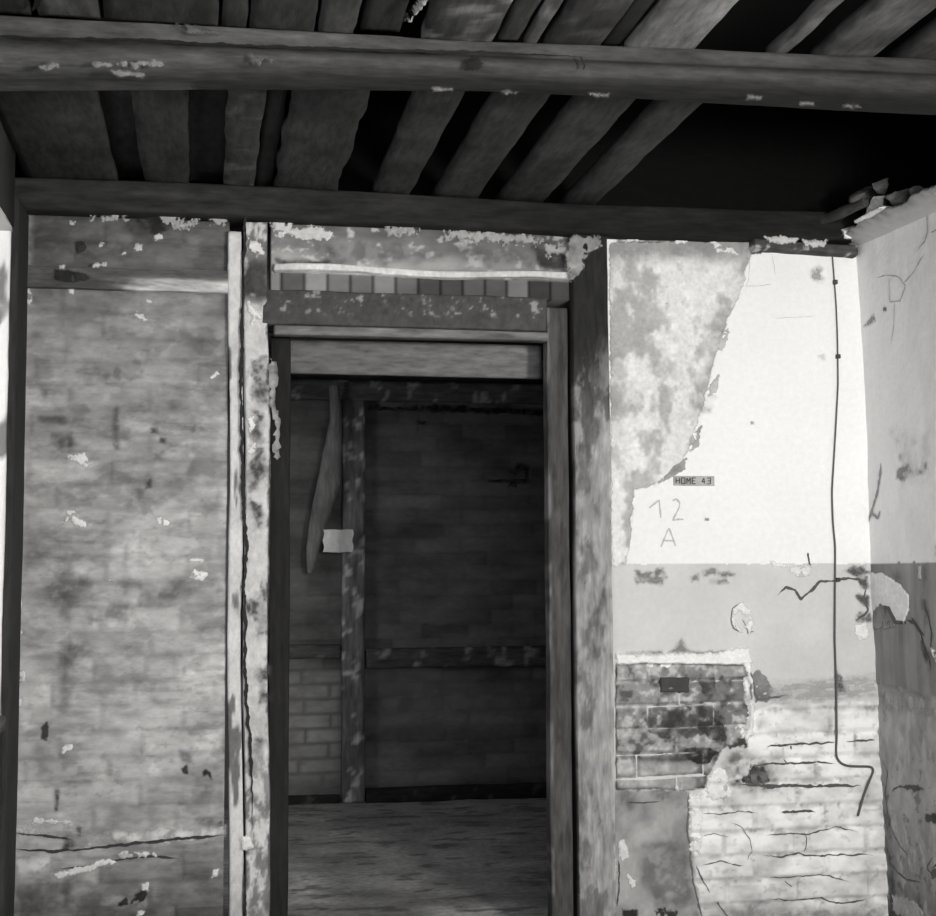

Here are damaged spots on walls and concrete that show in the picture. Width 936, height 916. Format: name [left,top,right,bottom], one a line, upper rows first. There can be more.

peeling [248,238,265,254]
flaking render [270,222,334,241]
peeling [253,361,268,402]
flaking render [565,235,761,567]
peeling [247,411,265,488]
crack [777,553,869,620]
flaking render [855,572,910,640]
flaking render [615,663,772,854]
peeling [241,836,254,850]
flaking render [616,839,629,867]
spalling [656,907,678,916]